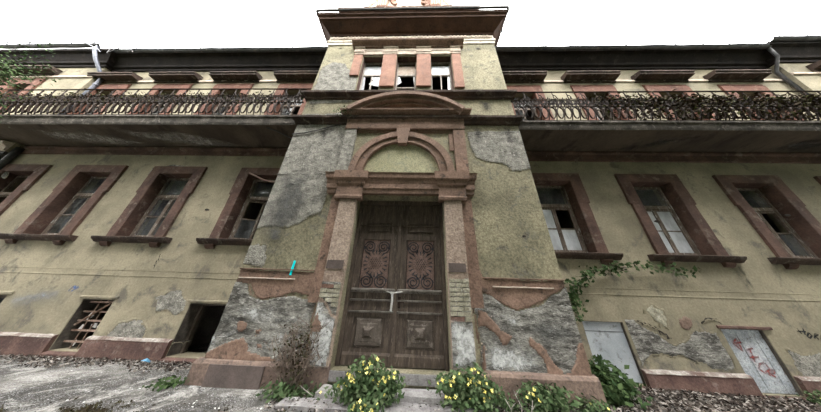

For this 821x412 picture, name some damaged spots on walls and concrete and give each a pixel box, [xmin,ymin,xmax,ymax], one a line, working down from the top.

flaking render [208,280,341,367]
flaking render [449,278,582,374]
flaking render [624,303,738,373]